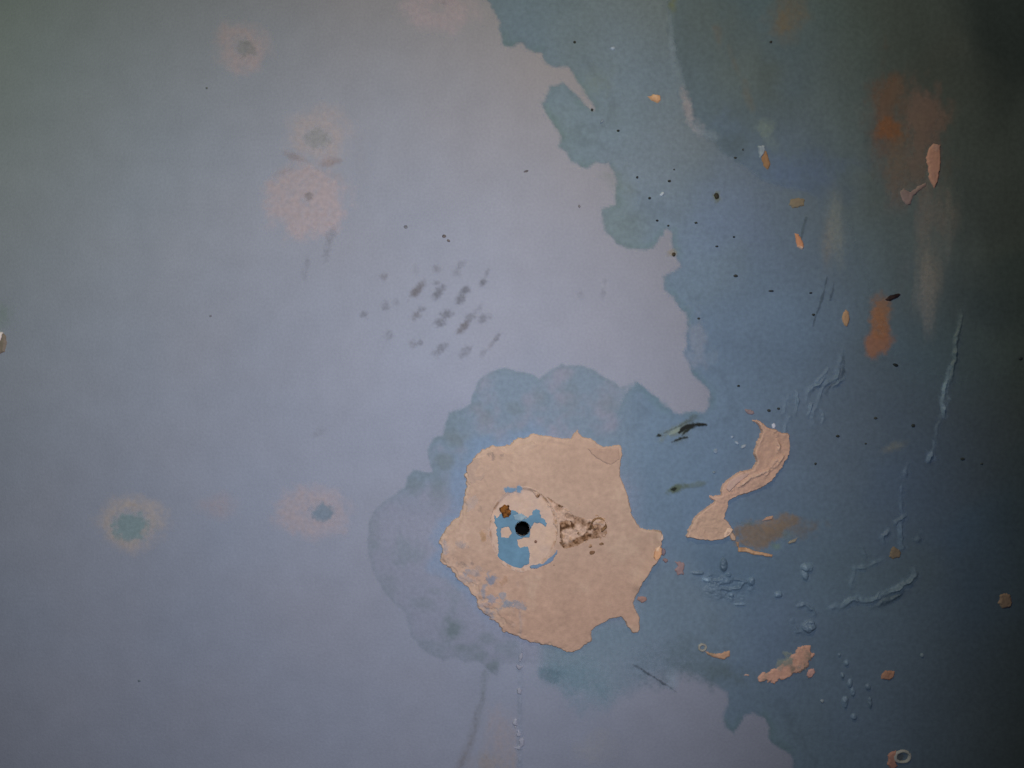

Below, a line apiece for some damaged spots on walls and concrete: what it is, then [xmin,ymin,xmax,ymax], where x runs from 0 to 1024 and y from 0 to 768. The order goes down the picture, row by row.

peeling [900,144,941,205]
water stain [372,0,1024,768]
corrosion [866,300,890,356]
flaking render [439,430,685,652]
flaking render [685,409,798,557]
peeling [744,645,815,684]